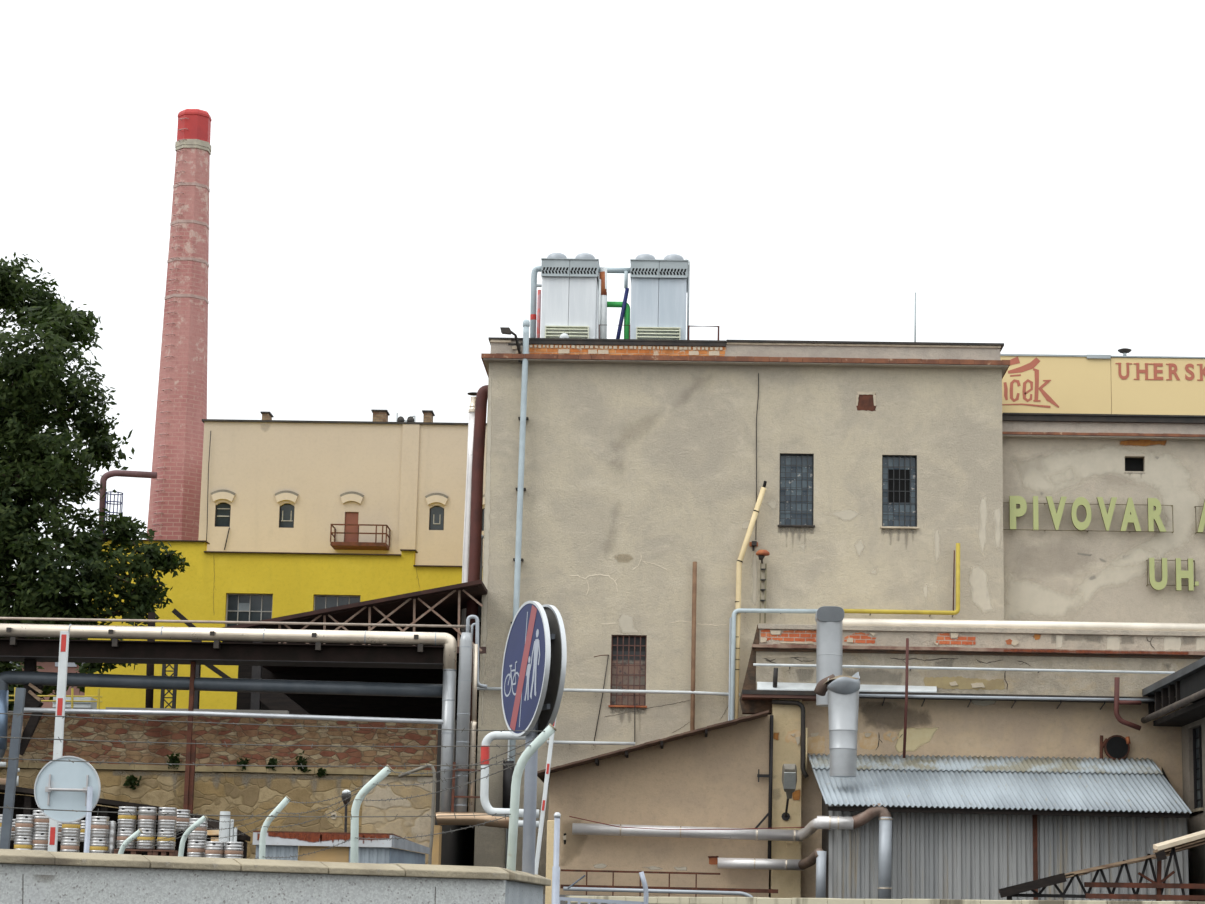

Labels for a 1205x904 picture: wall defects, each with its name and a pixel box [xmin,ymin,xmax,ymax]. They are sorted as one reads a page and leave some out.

flaking render [510,344,726,356]
efflorescence [978,498,1001,552]
efflorescence [969,566,993,612]
flaking render [760,629,817,659]
flaking render [844,632,876,644]
flaking render [933,633,976,645]